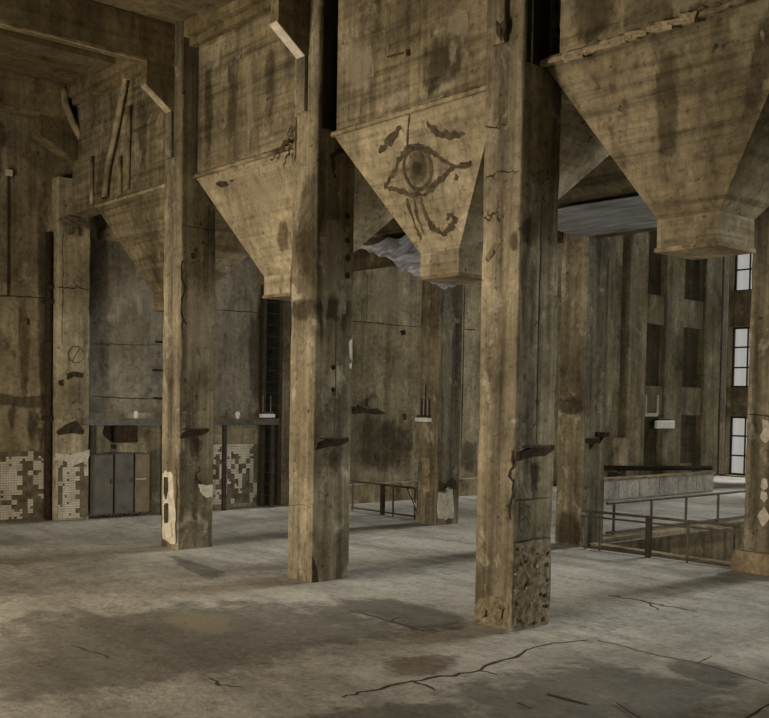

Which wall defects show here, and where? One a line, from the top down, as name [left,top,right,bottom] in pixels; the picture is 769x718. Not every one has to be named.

crack [506,450,551,543]
spalling [474,539,550,630]
crack [342,640,766,697]
crack [745,704,769,718]